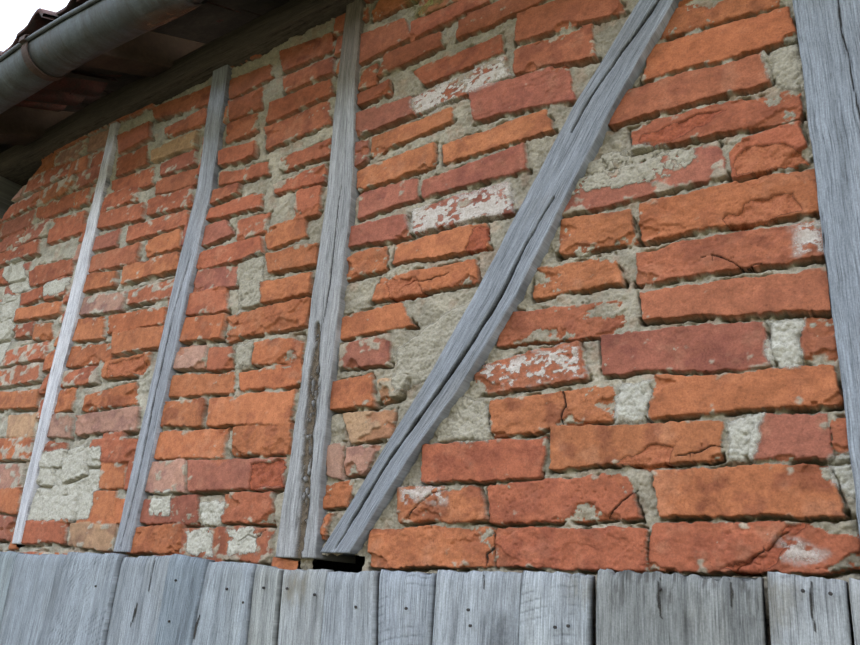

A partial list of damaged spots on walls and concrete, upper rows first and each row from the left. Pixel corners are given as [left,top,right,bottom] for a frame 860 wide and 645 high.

crack [702,255,762,273]